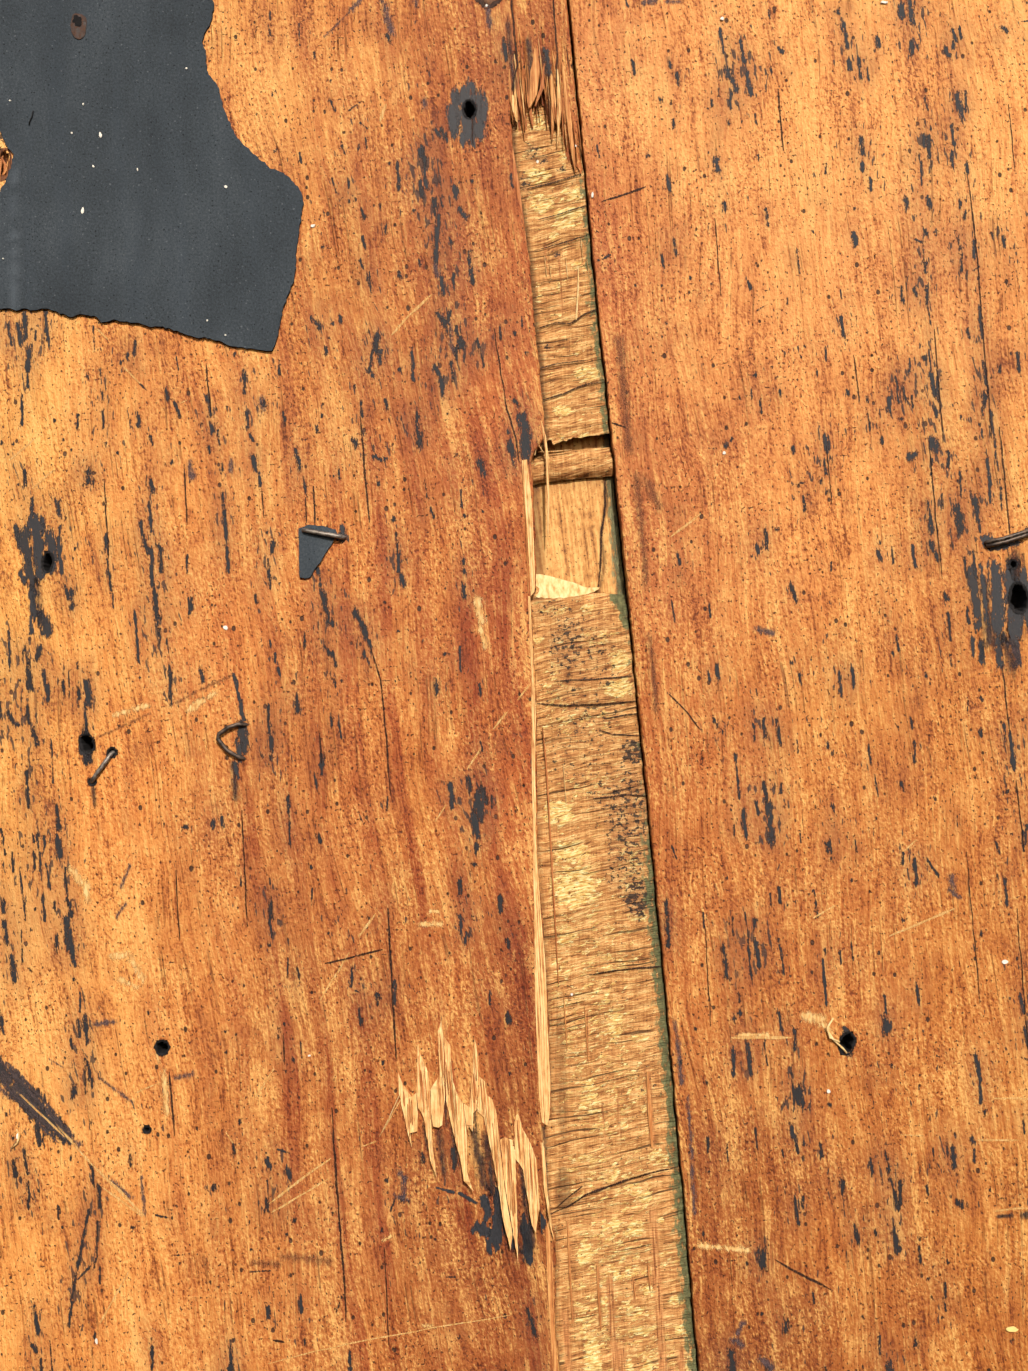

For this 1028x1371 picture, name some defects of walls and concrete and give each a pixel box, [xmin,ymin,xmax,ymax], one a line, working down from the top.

spalling [0,148,12,182]
peeling [508,27,698,1371]